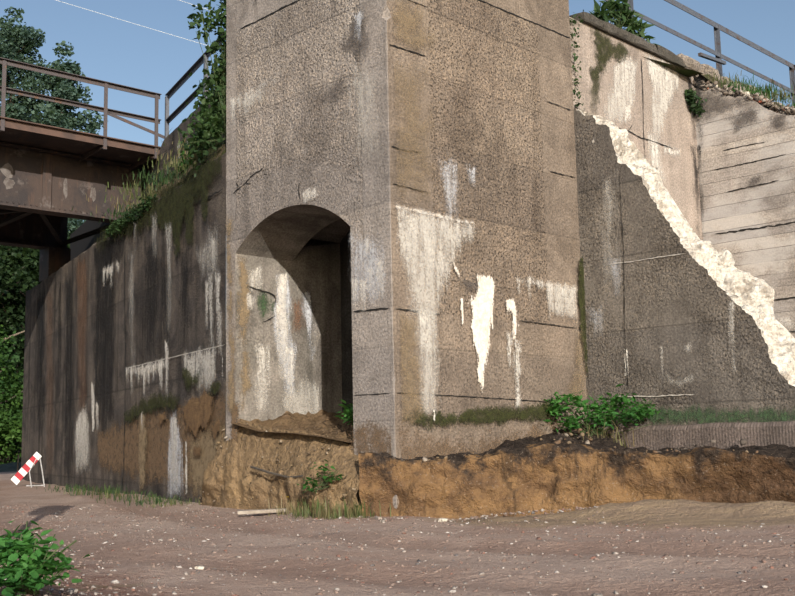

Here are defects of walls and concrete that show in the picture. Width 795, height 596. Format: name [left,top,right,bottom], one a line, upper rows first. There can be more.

damp [343,12,368,53]
damp [589,66,601,98]
damp [36,297,45,430]
damp [58,234,124,474]
damp [126,237,172,384]
damp [166,177,209,339]
damp [184,273,223,395]
damp [255,273,294,408]
spalling [576,56,795,386]
crack [714,142,786,170]
crack [716,221,795,234]
efflorescence [168,417,187,494]